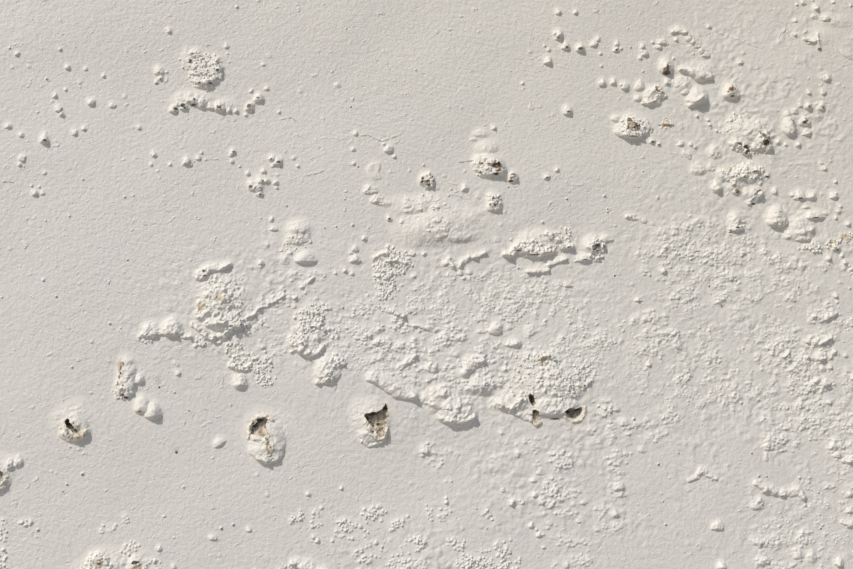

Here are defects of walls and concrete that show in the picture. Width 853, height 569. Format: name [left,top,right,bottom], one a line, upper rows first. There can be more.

peeling [186,211,853,569]